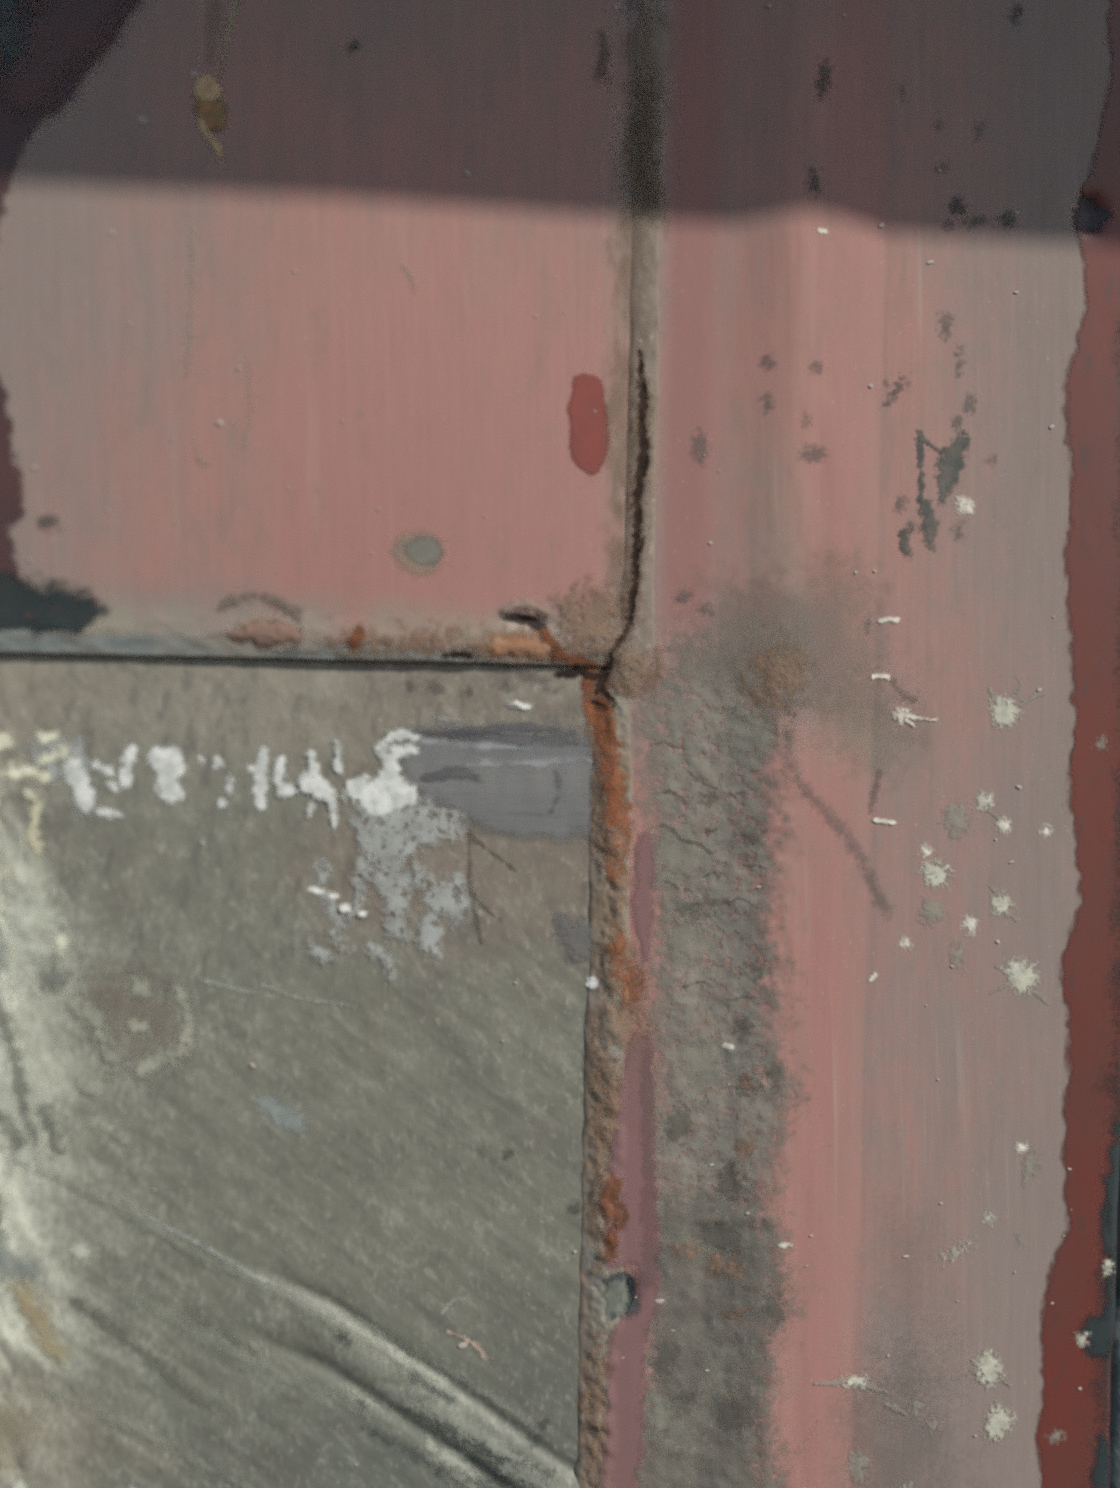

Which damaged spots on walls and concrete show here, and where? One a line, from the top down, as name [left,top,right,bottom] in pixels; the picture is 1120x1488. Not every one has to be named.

leakage [0,0,136,214]
rust [193,0,239,160]
spalling [1073,196,1111,232]
leakage [0,383,26,586]
crack [556,349,650,709]
crack [443,650,473,658]
peeling [0,700,594,980]
rust [327,625,665,921]
peeling [586,976,598,989]
peeling [0,1016,51,1164]
rust [583,1049,629,1272]
spalling [333,1311,549,1488]